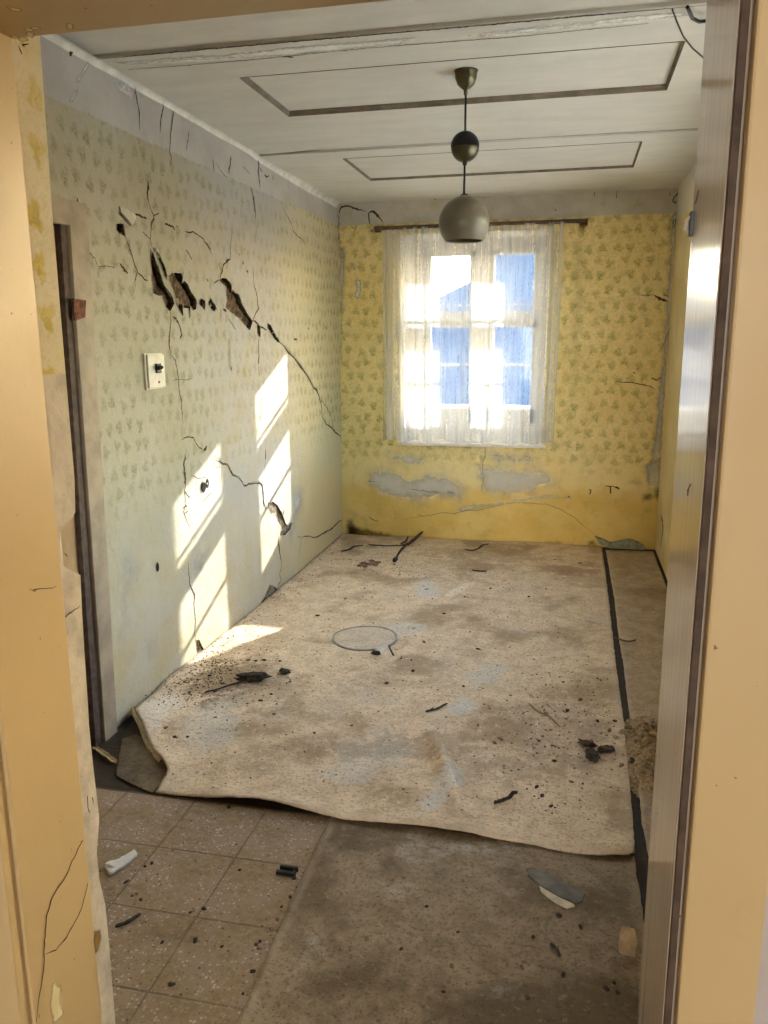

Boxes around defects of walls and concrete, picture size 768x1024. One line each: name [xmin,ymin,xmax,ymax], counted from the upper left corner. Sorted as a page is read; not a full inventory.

crack [102,5,702,166]
flaking render [150,247,281,343]
crack [90,142,451,442]
crack [169,312,266,527]
flaking render [268,497,300,539]
crack [277,520,341,588]
peeling [372,473,459,498]
crack [411,447,619,537]
peeling [484,457,549,491]
crack [188,567,196,641]
crack [36,842,88,1023]